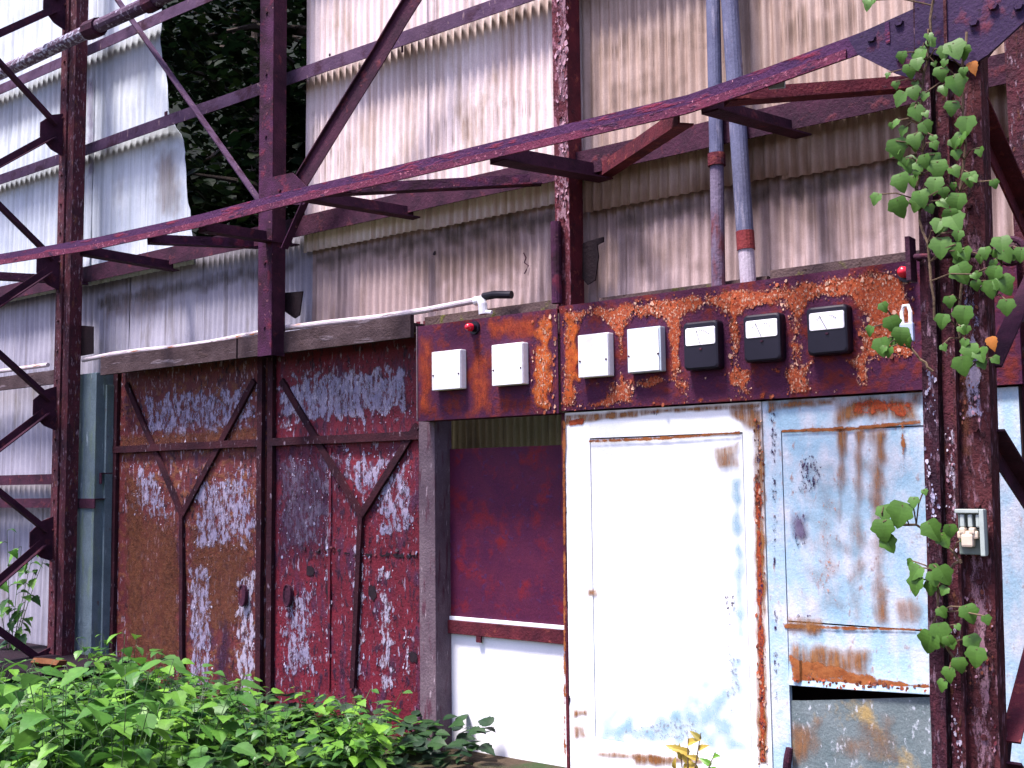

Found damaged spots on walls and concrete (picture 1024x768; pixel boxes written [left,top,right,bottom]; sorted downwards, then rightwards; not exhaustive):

peeling [142,378,257,444]
peeling [276,358,414,431]
rust [420,343,431,411]
rust [472,359,488,408]
peeling [130,463,172,525]
rust [489,266,929,766]
rust [127,478,179,672]
rust [192,535,249,628]
peeling [187,463,256,697]
peeling [276,447,415,697]
rust [965,554,997,768]